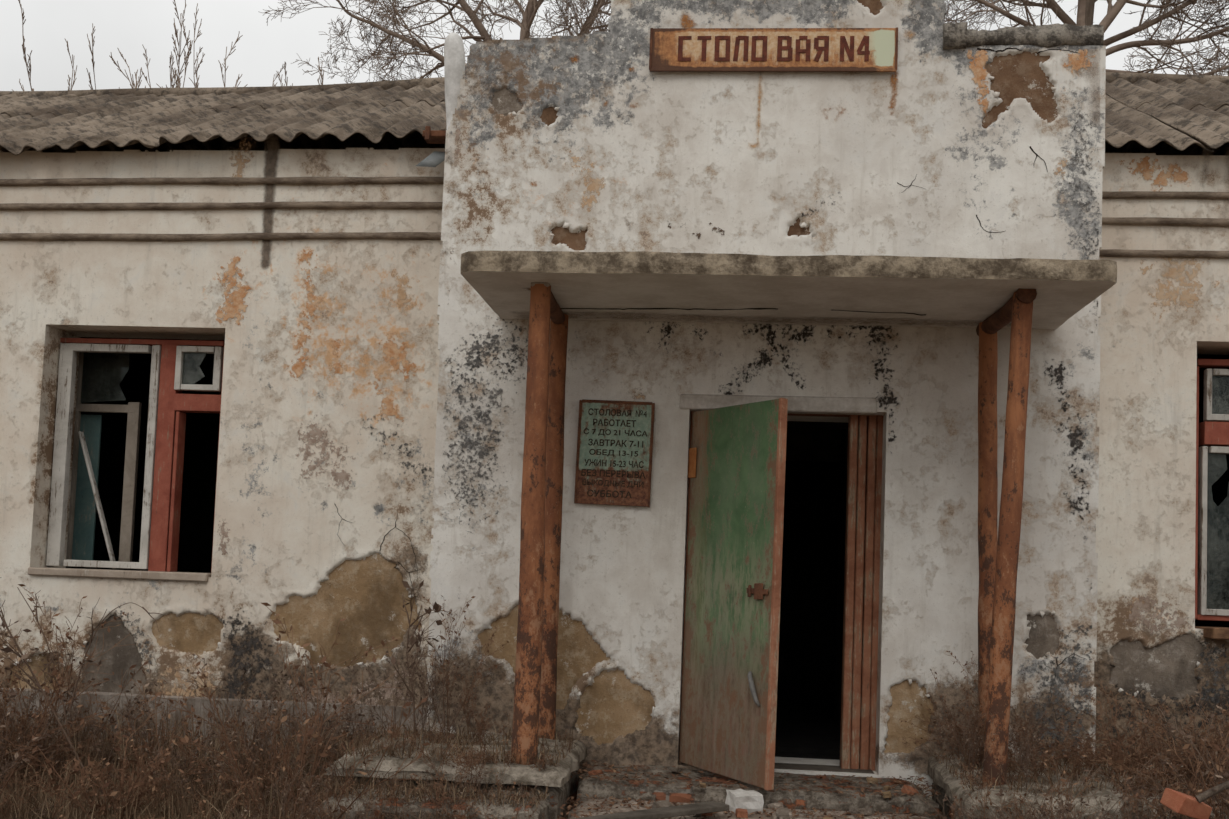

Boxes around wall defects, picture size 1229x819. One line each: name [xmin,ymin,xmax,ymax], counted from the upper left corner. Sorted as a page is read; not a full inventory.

flaking render [857,0,884,15]
flaking render [967,49,1096,128]
flaking render [550,222,587,250]
flaking render [787,218,811,237]
water stain [363,315,528,523]
water stain [564,313,981,453]
mould [1044,361,1090,527]
flaking render [82,612,224,697]
flaking render [270,553,422,706]
flaking render [477,605,518,673]
flaking render [556,610,656,745]